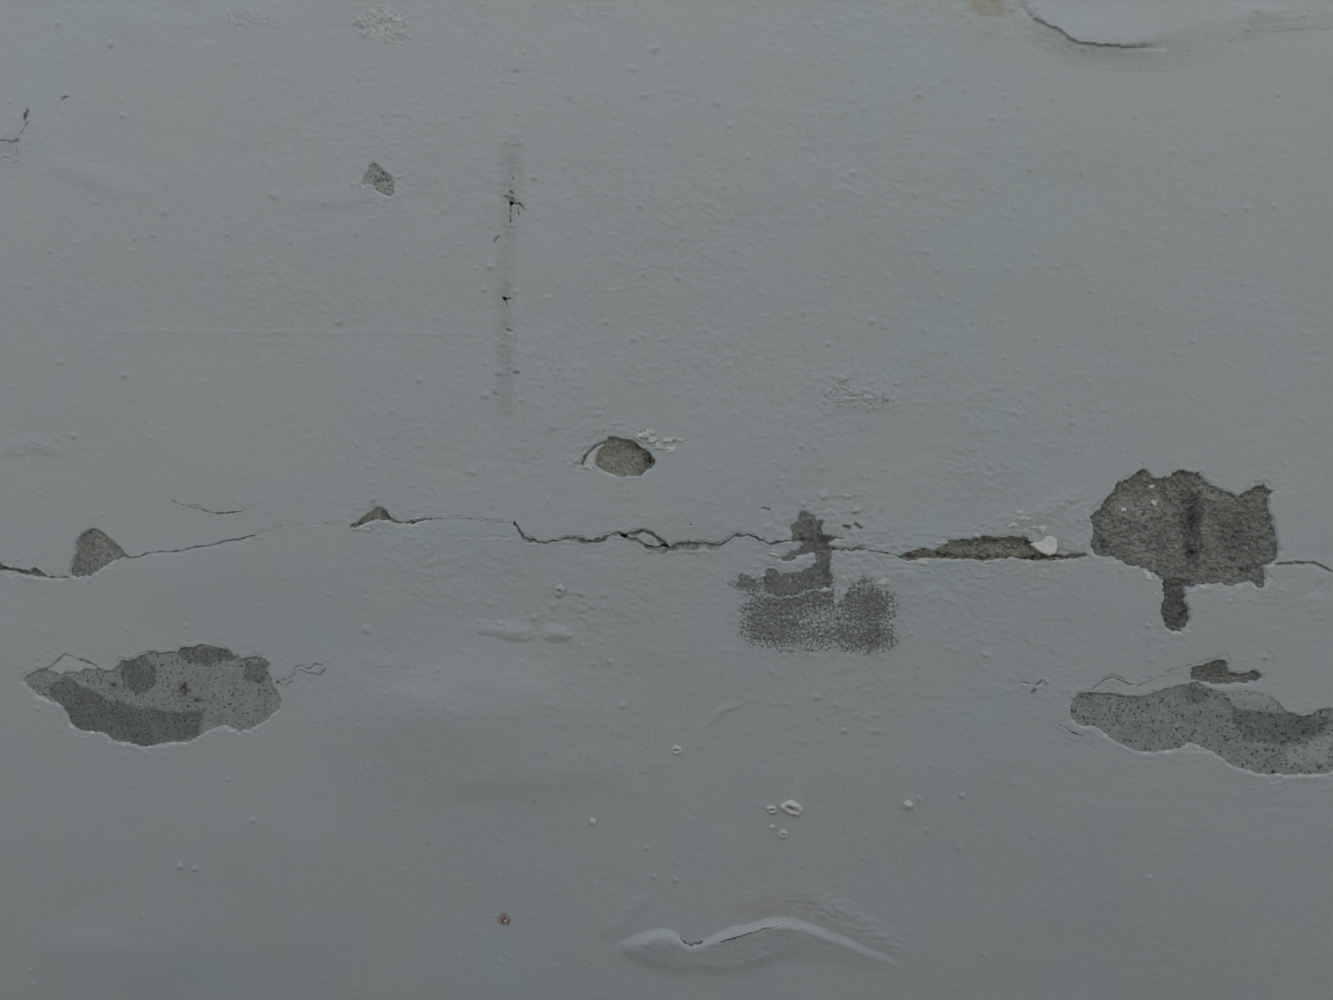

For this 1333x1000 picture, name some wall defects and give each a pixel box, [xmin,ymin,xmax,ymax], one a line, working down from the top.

peeling [346,146,410,213]
spalling [564,420,687,494]
crack [0,548,80,595]
peeling [53,513,139,593]
crack [125,497,258,559]
crack [425,503,802,558]
crack [842,518,908,565]
crack [1271,556,1333,574]
spalling [717,451,1333,793]
peeling [9,629,288,763]